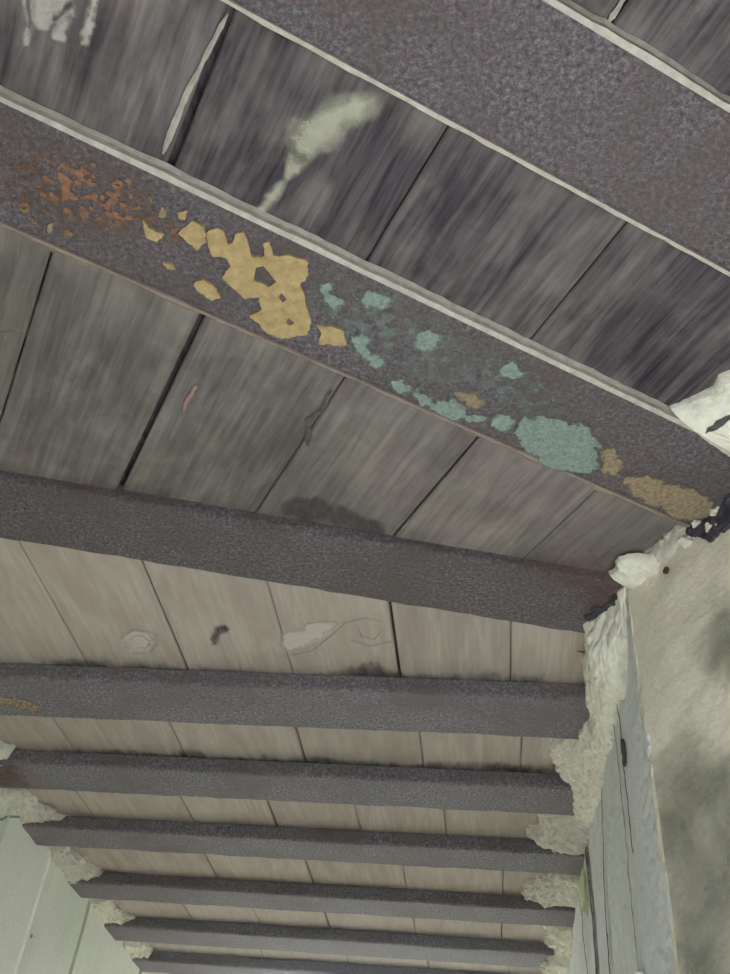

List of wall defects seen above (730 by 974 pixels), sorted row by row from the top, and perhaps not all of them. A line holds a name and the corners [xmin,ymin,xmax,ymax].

damp [22,0,75,46]
damp [81,0,98,45]
damp [257,95,374,213]
corrosion [10,155,182,242]
peeling [142,219,164,242]
peeling [178,210,730,549]
crack [705,415,730,433]